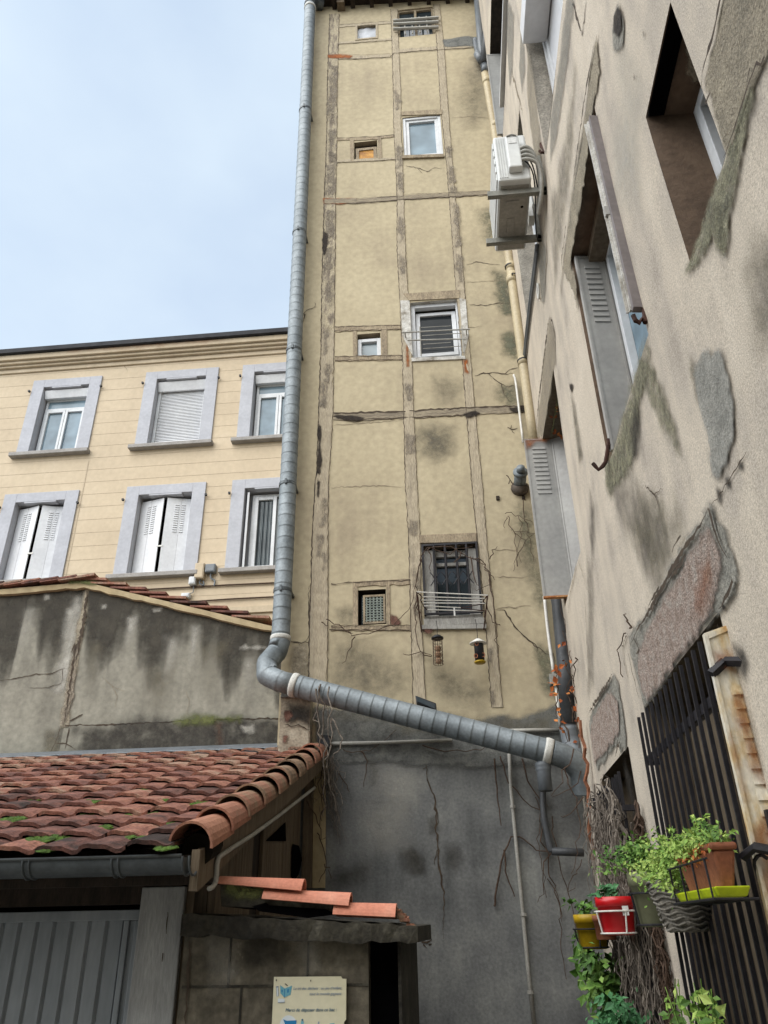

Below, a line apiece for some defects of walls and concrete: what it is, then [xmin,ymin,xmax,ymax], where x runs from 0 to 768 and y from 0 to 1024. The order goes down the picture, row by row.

peeling [326,66,338,195]
peeling [322,210,335,302]
damp [605,347,678,495]
damp [0,590,271,691]
spalling [628,503,737,707]
spalling [589,674,626,770]
crack [421,765,445,947]